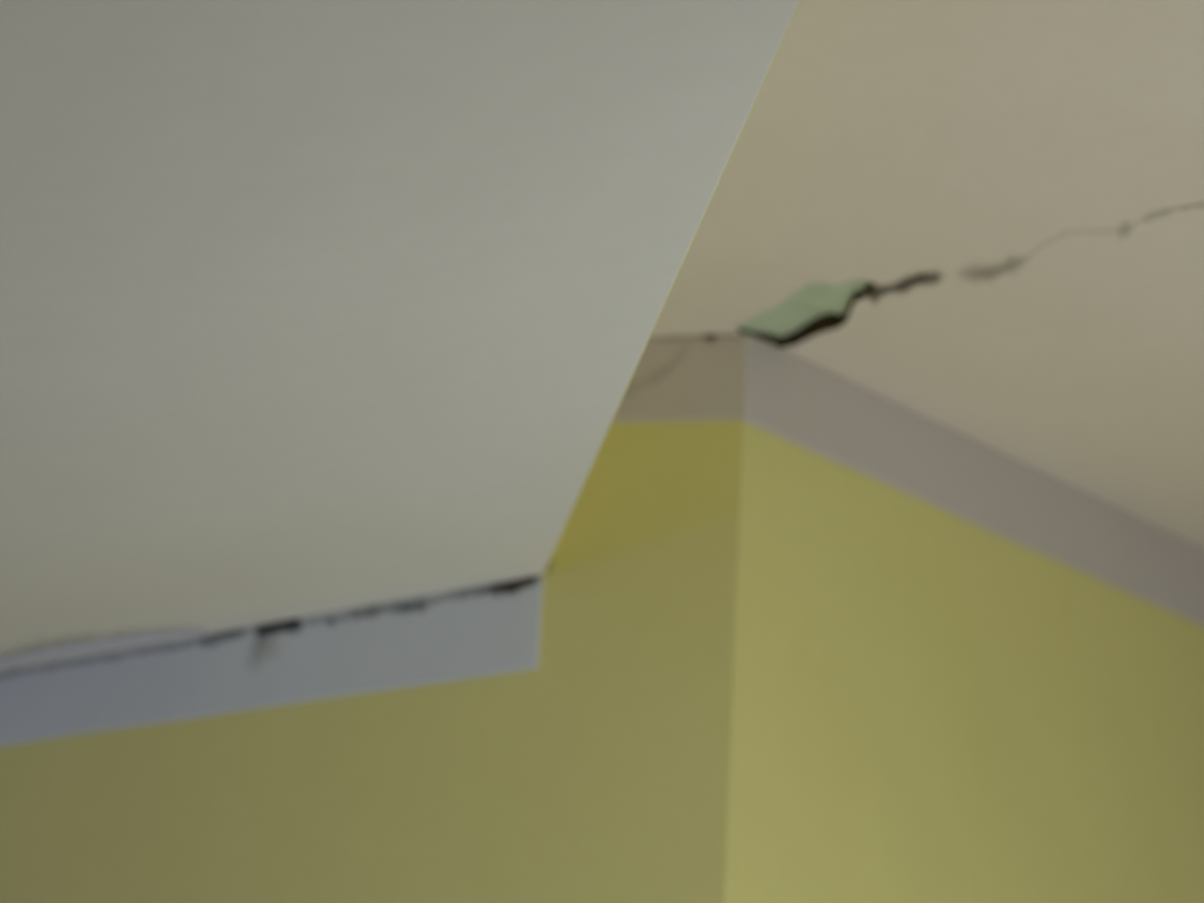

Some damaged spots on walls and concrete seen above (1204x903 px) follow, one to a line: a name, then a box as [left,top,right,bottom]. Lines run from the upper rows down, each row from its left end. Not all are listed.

crack [868,275,938,300]
flaking render [738,279,875,348]
crack [486,576,538,594]
crack [401,602,422,610]
crack [207,618,301,642]